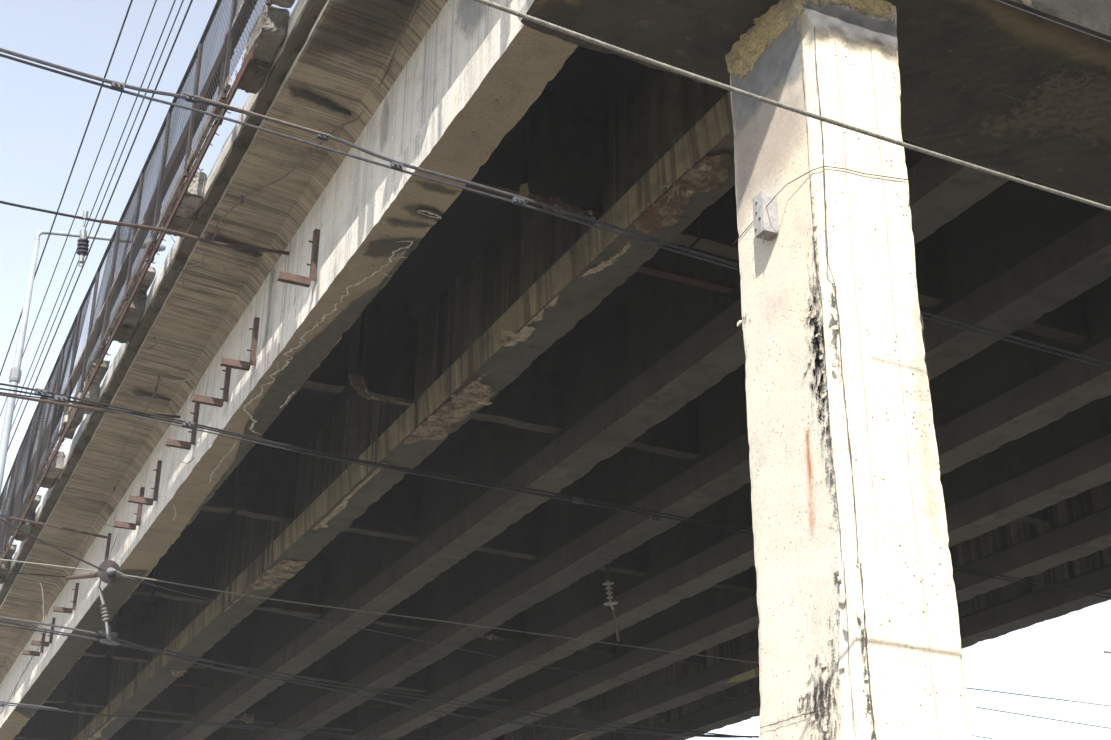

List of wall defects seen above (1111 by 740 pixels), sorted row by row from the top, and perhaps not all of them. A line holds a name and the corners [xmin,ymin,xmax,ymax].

spalling [577,241,632,278]
crack [209,240,413,484]
spalling [403,373,495,444]
crack [757,27,876,739]
spalling [223,559,307,612]